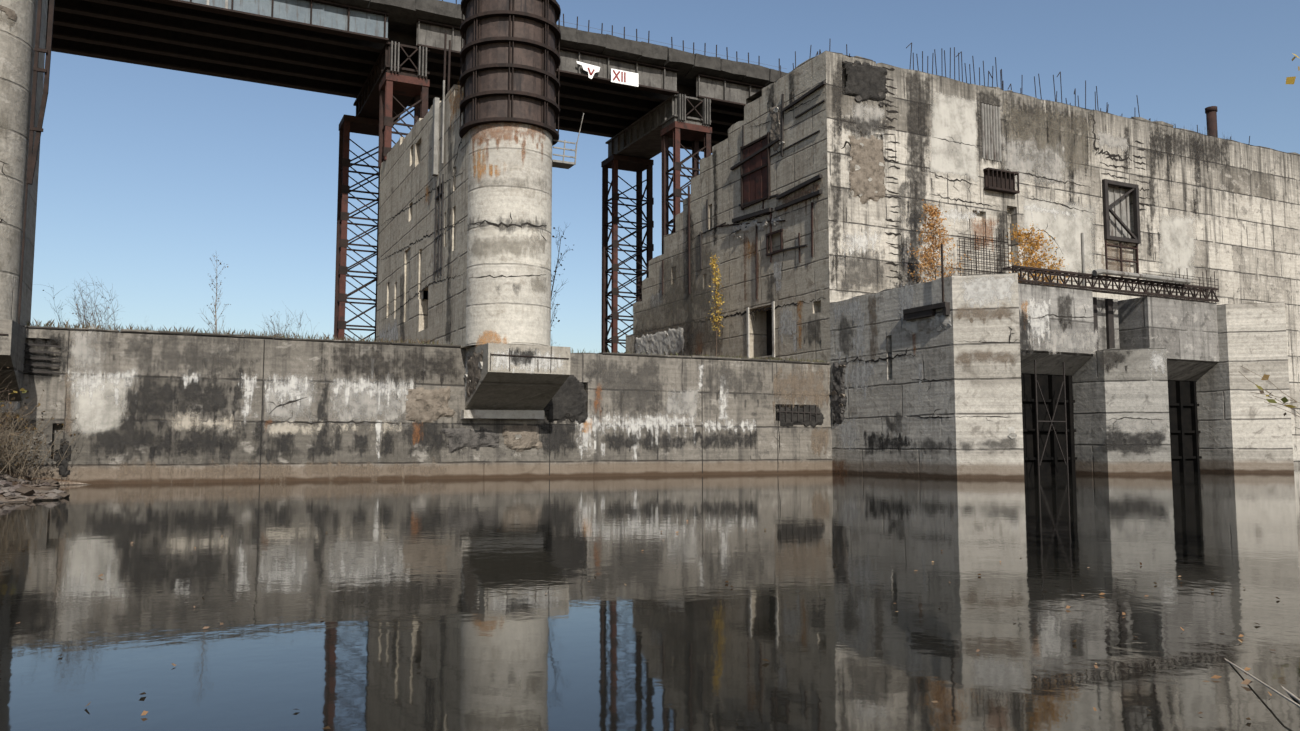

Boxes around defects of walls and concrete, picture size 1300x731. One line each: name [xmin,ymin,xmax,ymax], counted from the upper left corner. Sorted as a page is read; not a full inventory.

water stain [24,127,469,464]
crack [381,273,546,322]
crack [381,137,547,260]
corrosion [472,122,543,177]
water stain [765,63,1129,401]
water stain [1147,123,1230,280]